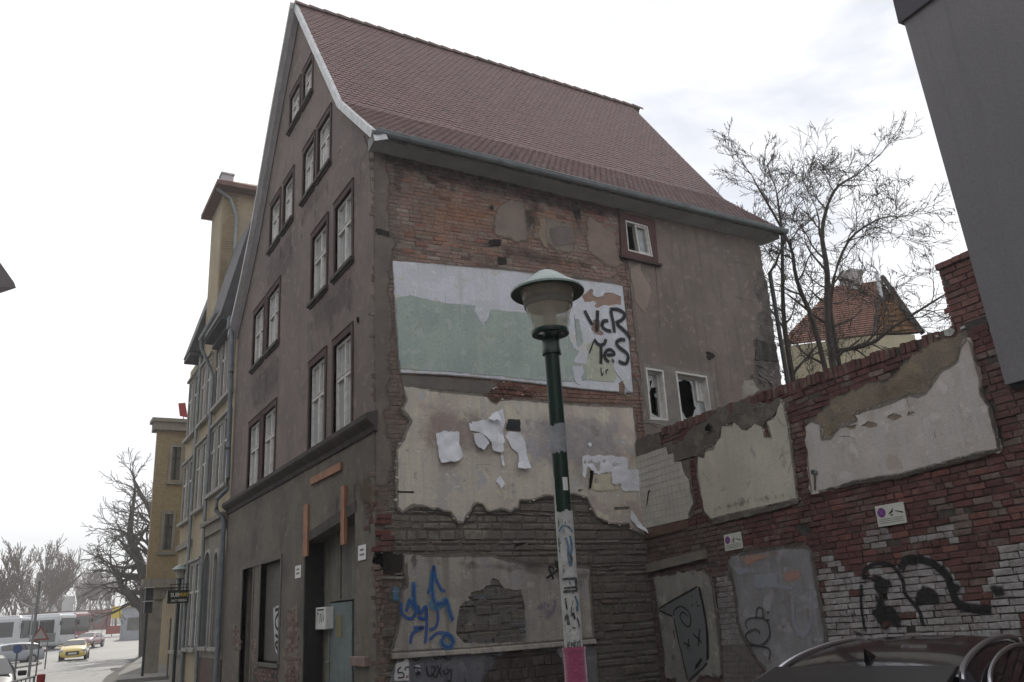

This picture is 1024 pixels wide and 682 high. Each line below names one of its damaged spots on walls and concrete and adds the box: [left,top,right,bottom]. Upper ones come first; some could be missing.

flaking render [488,199,535,265]
peeling [568,315,589,384]
peeling [582,289,622,336]
peeling [613,366,633,394]
spalling [741,270,787,414]
spalling [363,490,403,576]
flaking render [422,496,554,525]